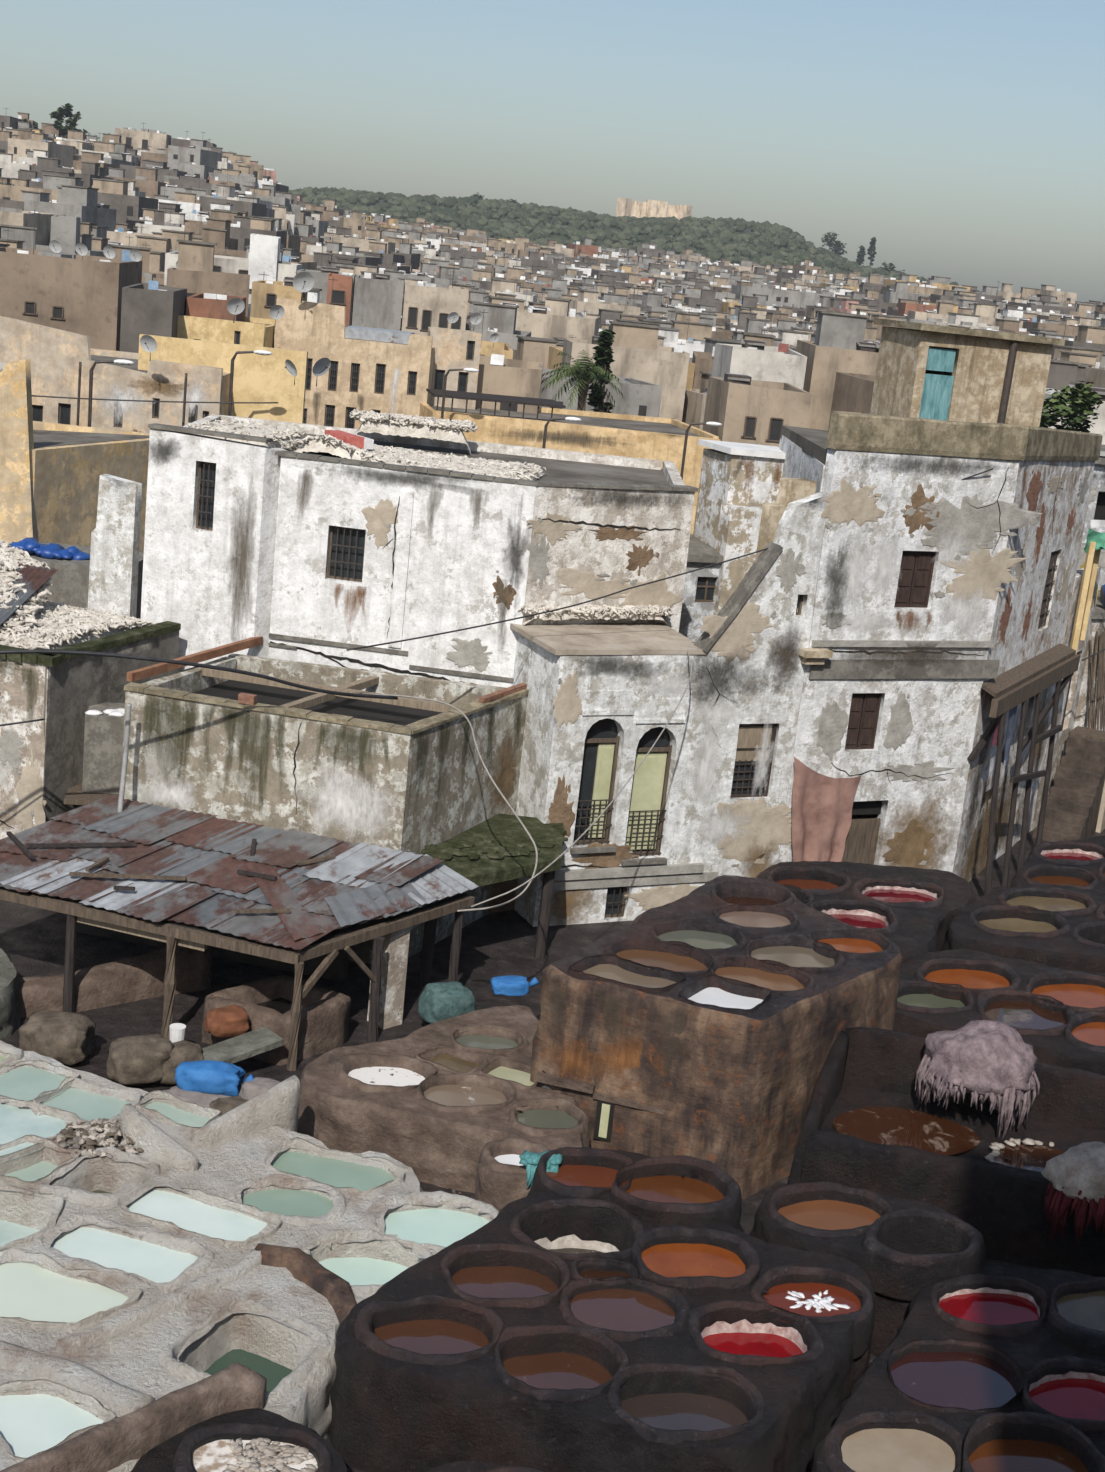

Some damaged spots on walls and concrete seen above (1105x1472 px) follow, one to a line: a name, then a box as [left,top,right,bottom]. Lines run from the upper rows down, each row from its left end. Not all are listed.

leakage [231,515,250,625]
flaking render [361,499,399,549]
crack [538,518,680,531]
flaking render [492,512,776,663]
flaking render [776,548,806,595]
flaking render [820,463,1105,656]
flaking render [445,638,493,673]
flaking render [0,728,47,831]
leakage [145,699,283,784]
leakage [318,727,388,766]
leakage [418,703,520,806]
flaking render [882,822,932,865]